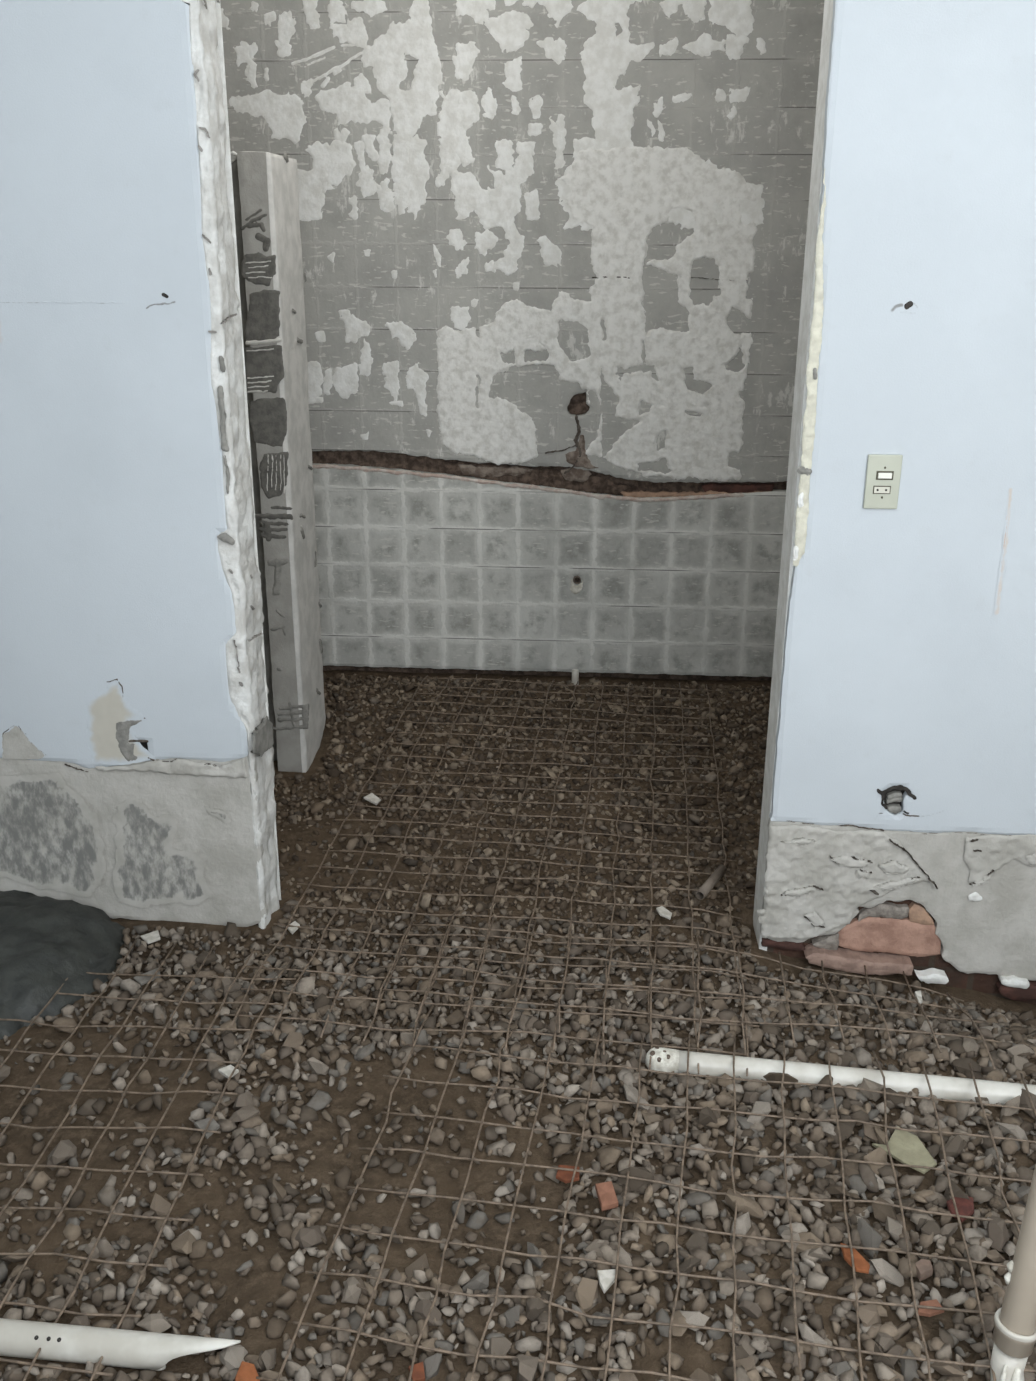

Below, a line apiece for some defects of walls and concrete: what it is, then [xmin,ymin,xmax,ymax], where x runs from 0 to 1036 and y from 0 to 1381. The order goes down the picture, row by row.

flaking render [64,0,774,934]
spalling [792,170,826,566]
peeling [2,726,46,760]
flaking render [761,785,949,1004]
flaking render [964,834,1036,901]
spalling [996,975,1036,1001]